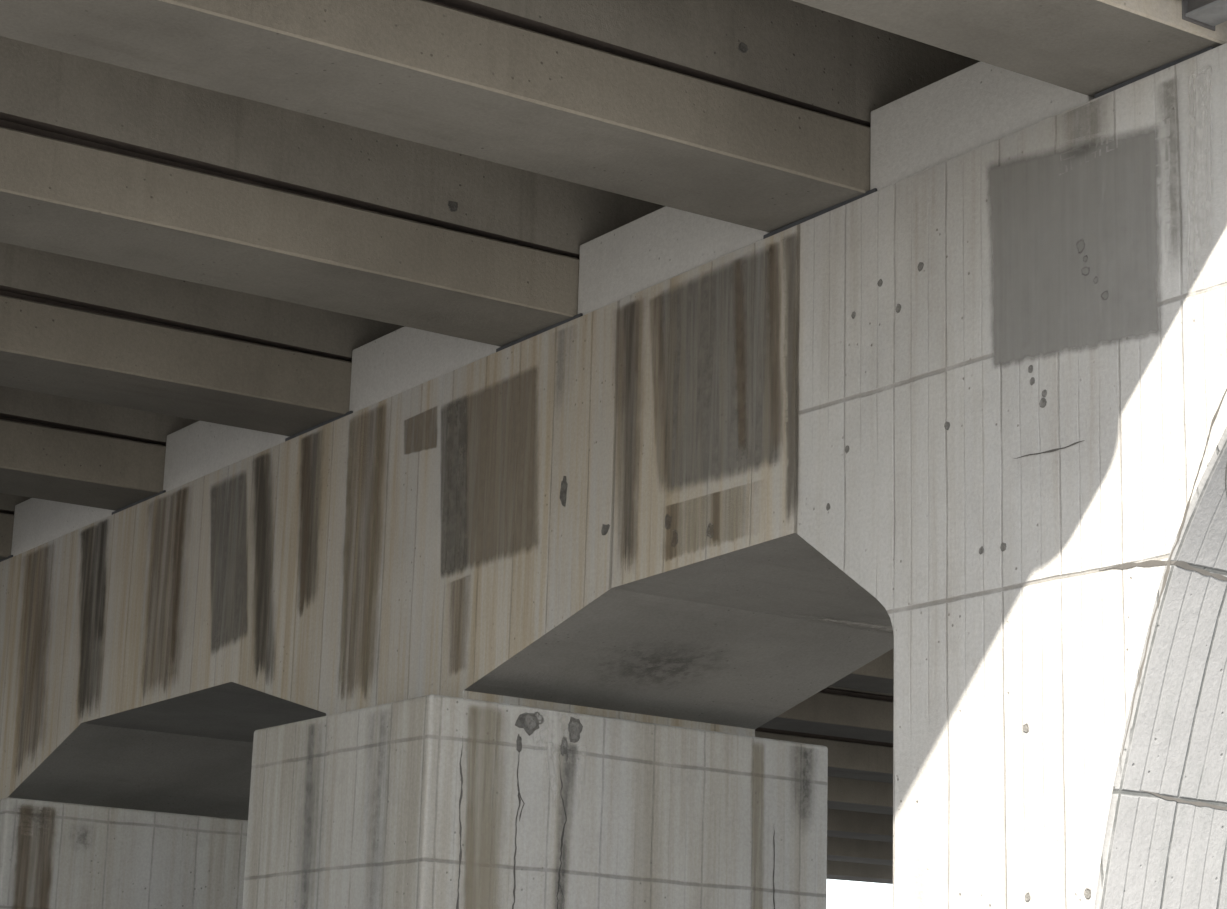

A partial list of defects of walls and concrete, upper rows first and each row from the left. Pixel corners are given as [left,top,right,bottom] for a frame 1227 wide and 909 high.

water stain [775,237,797,514]
crack [1013,440,1085,459]
water stain [80,522,105,707]
spalling [515,712,544,753]
spalling [560,717,583,756]
crack [512,746,525,909]
crack [557,755,567,909]